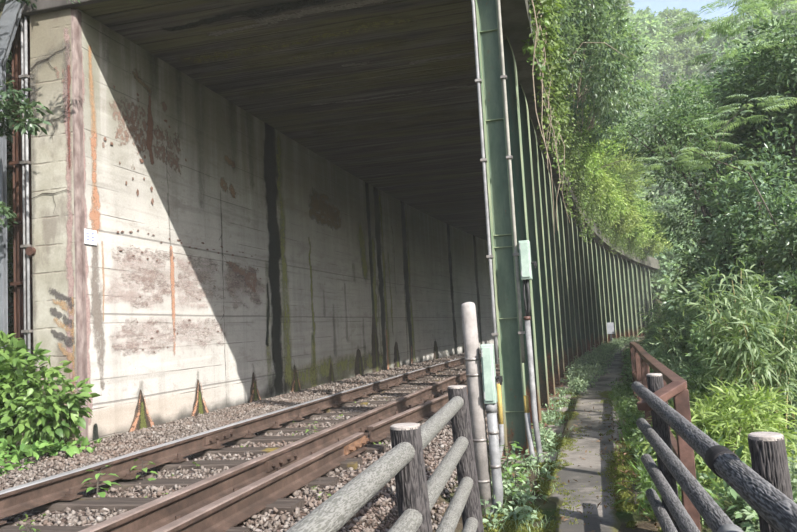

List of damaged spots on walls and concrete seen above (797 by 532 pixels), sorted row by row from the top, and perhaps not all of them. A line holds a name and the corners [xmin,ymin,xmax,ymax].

crack [31,47,66,70]
corrosion [89,46,100,232]
spalling [102,69,187,204]
peeling [117,229,261,293]
leakage [264,123,415,398]